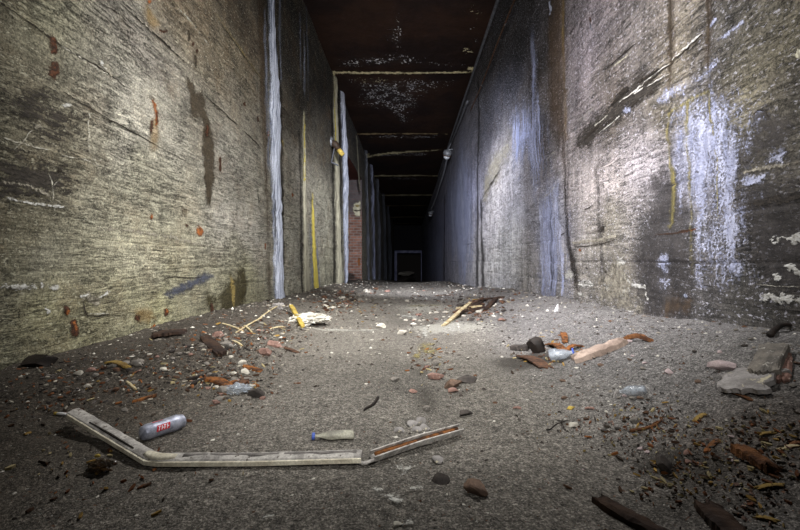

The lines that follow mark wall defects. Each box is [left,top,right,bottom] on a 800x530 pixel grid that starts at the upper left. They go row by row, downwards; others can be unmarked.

corrosion [48,34,60,80]
corrosion [150,99,159,134]
water stain [187,77,222,205]
water stain [264,0,285,299]
water stain [331,55,476,284]
water stain [634,81,800,317]
peeling [769,232,800,245]
peeling [772,263,800,282]
peeling [760,292,800,304]